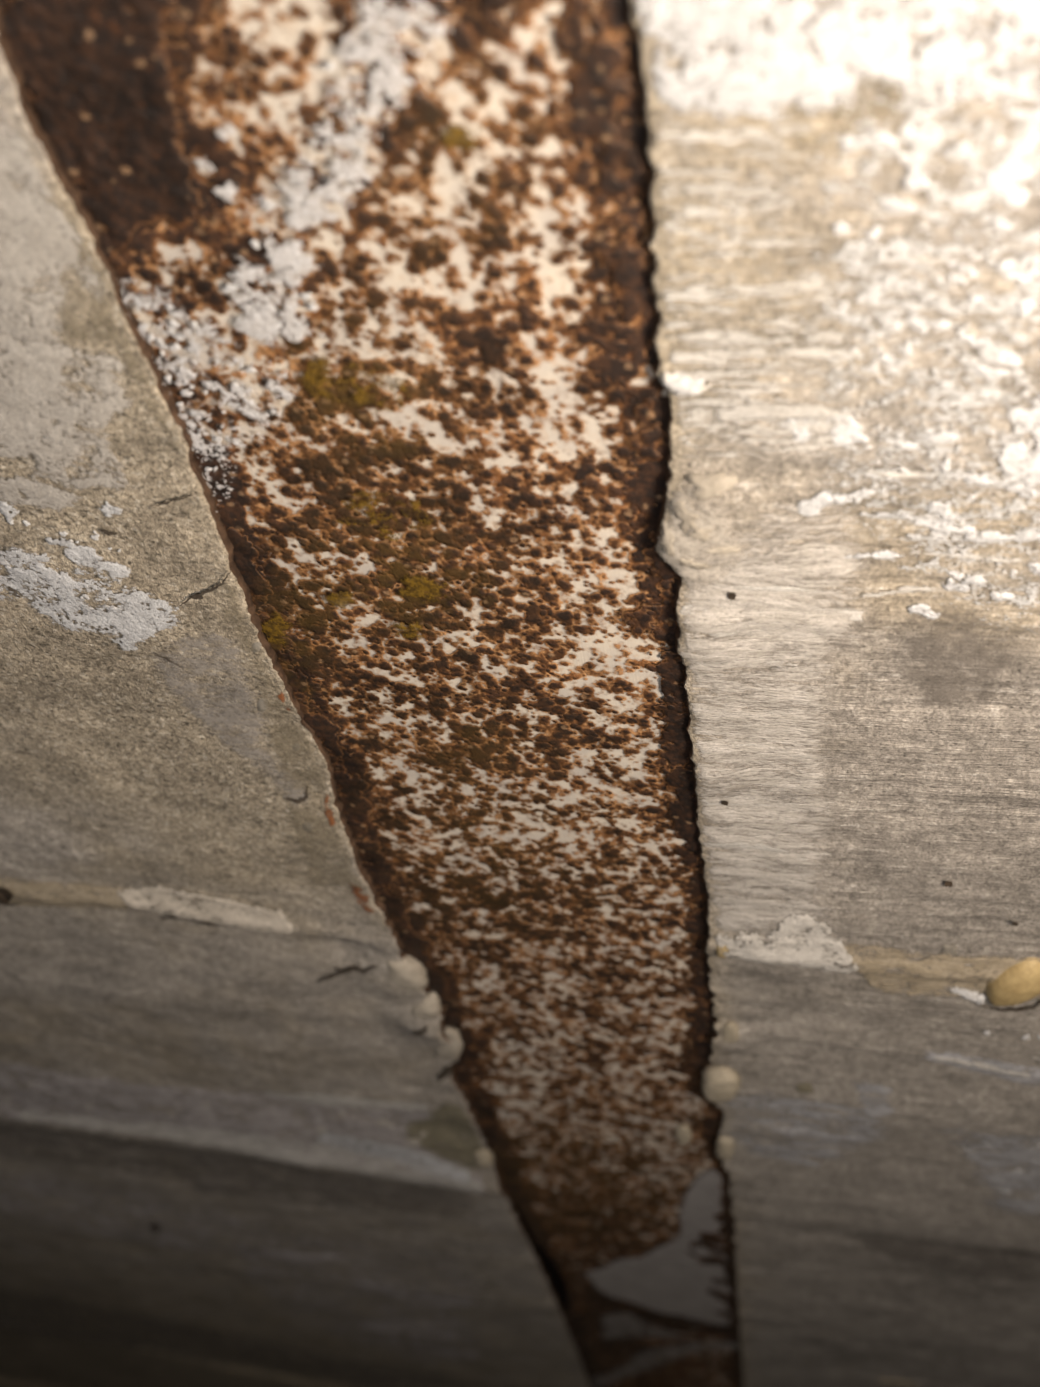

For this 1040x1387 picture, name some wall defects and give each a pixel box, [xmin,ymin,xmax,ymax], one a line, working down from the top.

damp [657,115,866,464]
damp [866,470,939,479]
efflorescence [0,501,31,527]
efflorescence [98,501,123,518]
efflorescence [0,530,180,651]
damp [860,586,945,599]
corrosion [0,0,743,1387]
efflorescence [715,914,859,974]
crack [317,965,377,983]
crack [412,1026,428,1035]
crack [437,1066,453,1081]
crack [511,1200,569,1312]